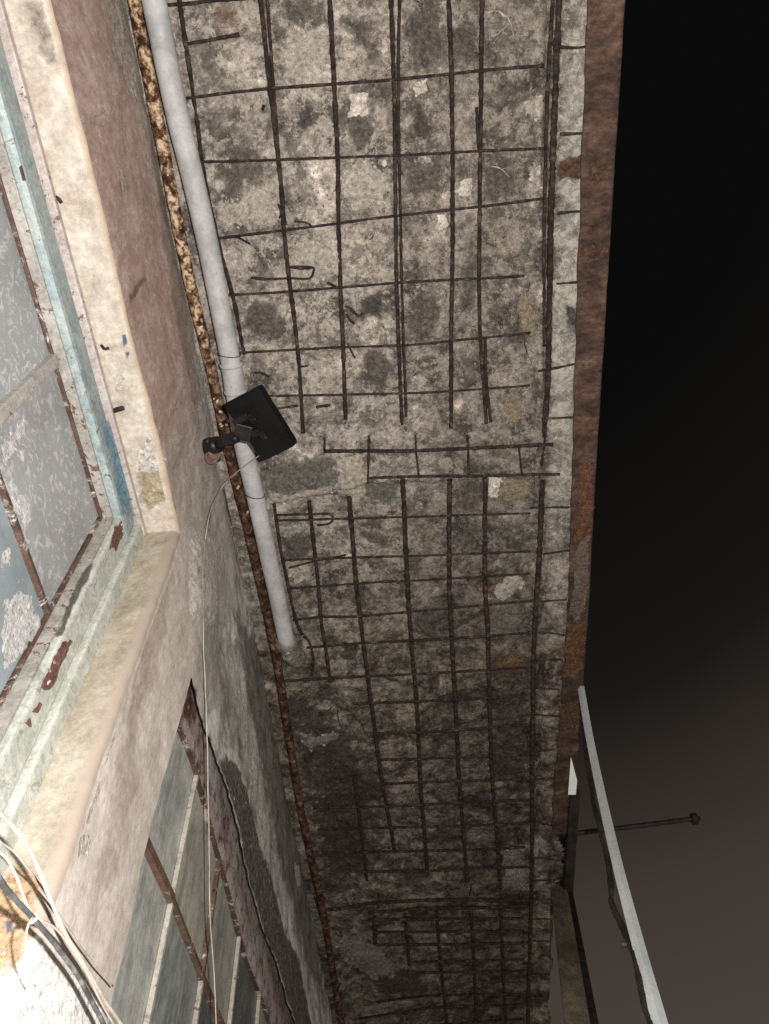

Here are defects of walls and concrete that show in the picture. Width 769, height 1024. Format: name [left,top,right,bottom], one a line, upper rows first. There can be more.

spalling [167,0,562,1024]
damp [342,642,359,660]
damp [490,598,532,634]
peeling [570,536,590,621]
damp [279,690,390,891]